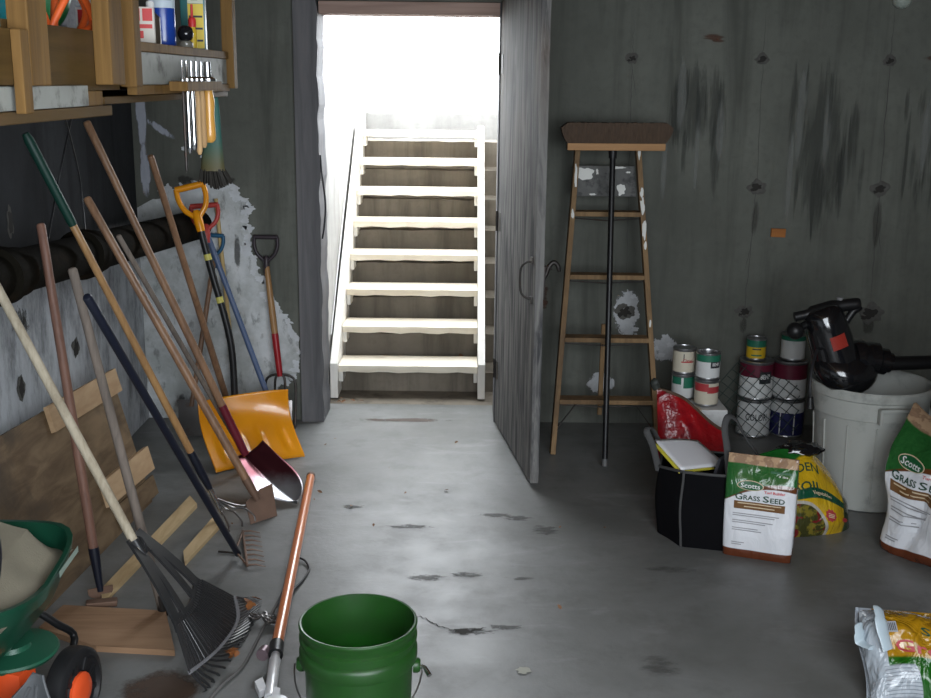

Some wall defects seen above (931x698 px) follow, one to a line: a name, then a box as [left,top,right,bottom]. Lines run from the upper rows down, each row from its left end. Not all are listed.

damp [13,308,29,331]
peeling [137,180,300,418]